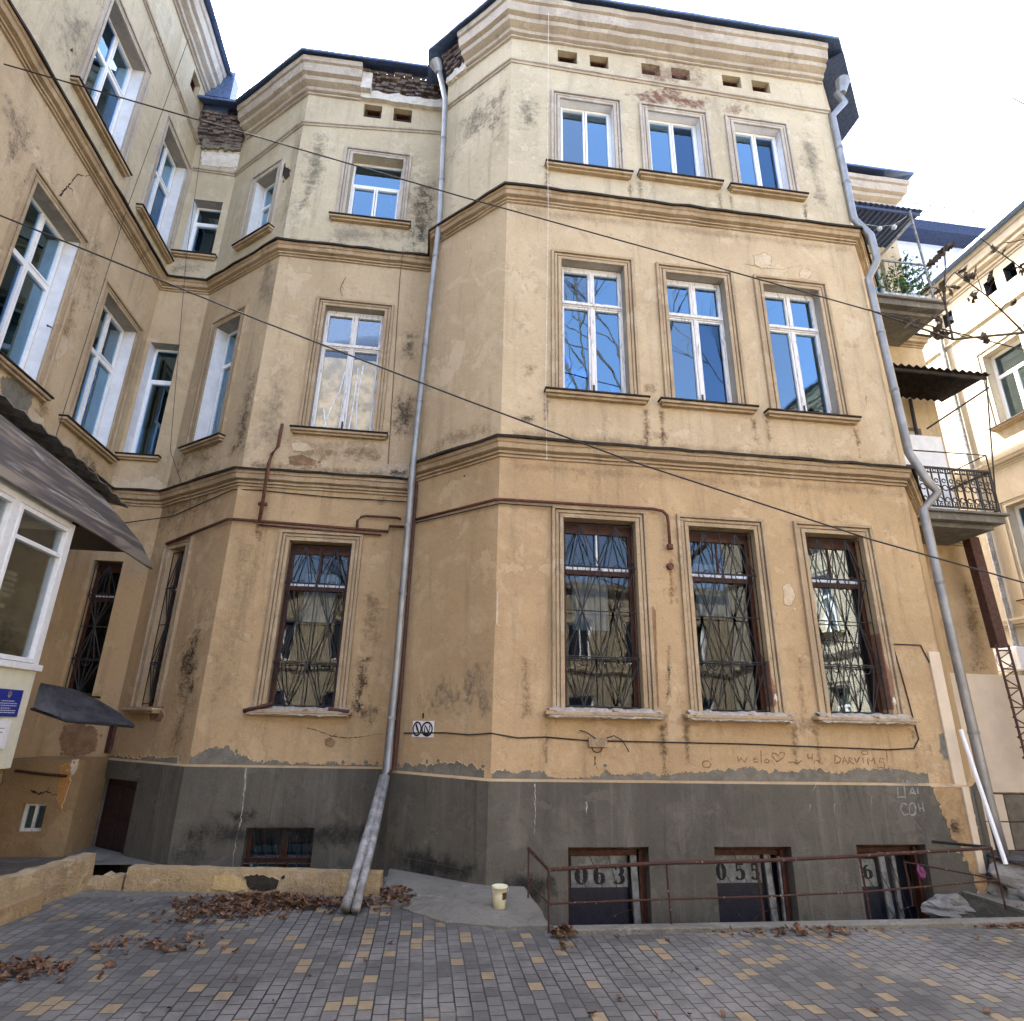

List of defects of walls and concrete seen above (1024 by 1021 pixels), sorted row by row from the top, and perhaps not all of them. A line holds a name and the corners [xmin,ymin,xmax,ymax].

crack [59,174,90,196]
peeling [288,440,321,468]
peeling [782,582,796,611]
leakage [179,630,205,702]
leakage [355,657,377,716]
spalling [56,723,103,809]
crack [232,768,247,867]
peeling [397,759,988,894]
spalling [207,873,285,893]